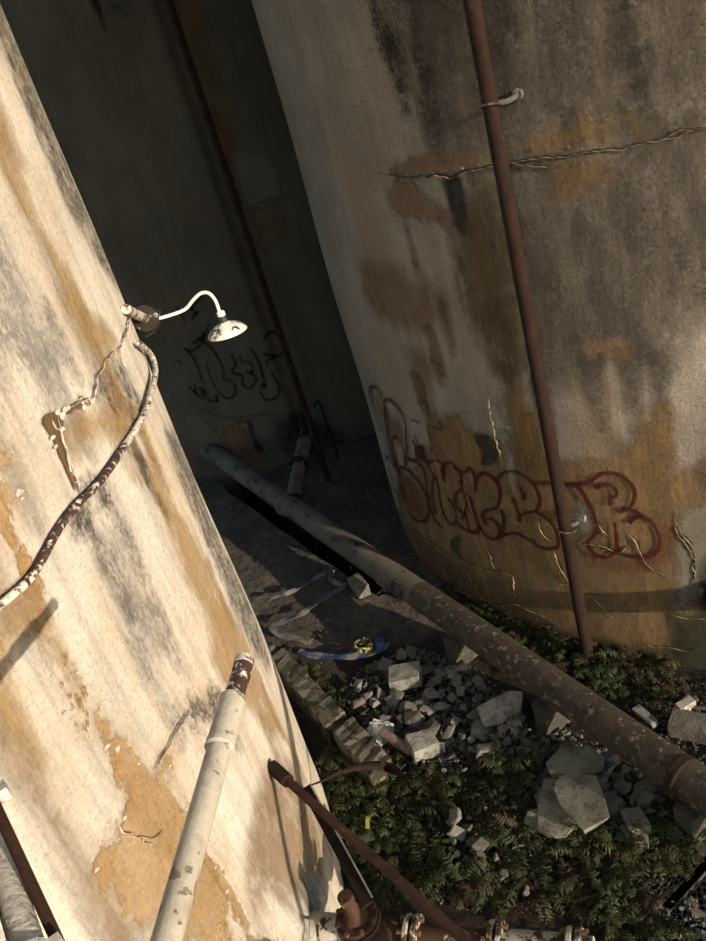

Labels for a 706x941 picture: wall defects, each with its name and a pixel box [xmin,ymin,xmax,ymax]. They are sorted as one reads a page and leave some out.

damp [369,0,525,395]
crack [374,126,706,179]
damp [481,0,706,410]
crack [52,317,132,494]
crack [488,398,502,460]
peeling [0,483,45,609]
crack [391,444,561,627]
peeling [395,401,706,660]
crack [538,515,697,619]
damp [668,506,706,671]
peeling [59,655,187,941]
peeling [183,852,250,941]